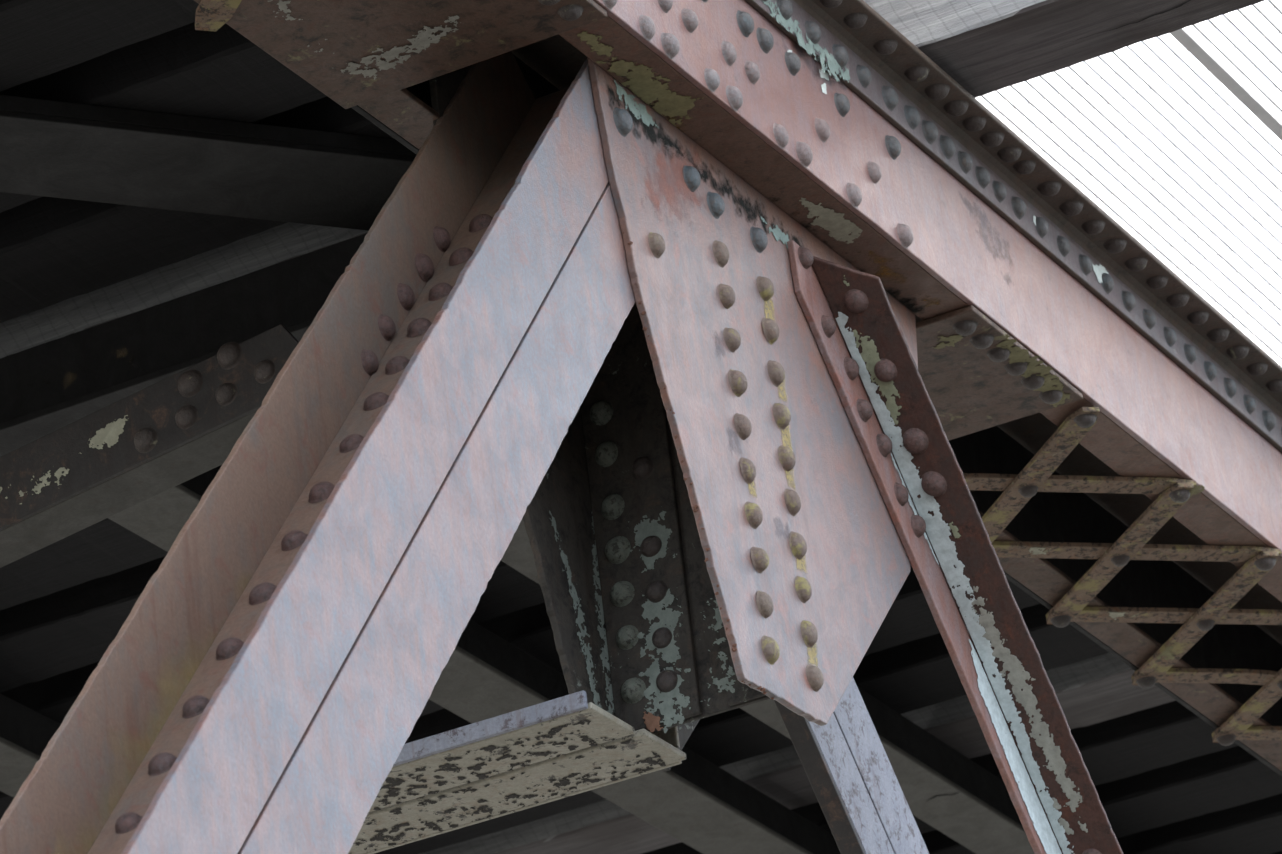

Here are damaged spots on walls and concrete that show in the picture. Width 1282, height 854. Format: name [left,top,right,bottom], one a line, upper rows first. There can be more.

peeling [267,0,303,21]
crack [1058,0,1190,46]
peeling [307,15,464,80]
peeling [573,31,703,126]
peeling [799,198,863,244]
peeling [81,415,128,454]
peeling [0,467,70,505]
peeling [836,312,1088,854]
peeling [349,720,666,854]